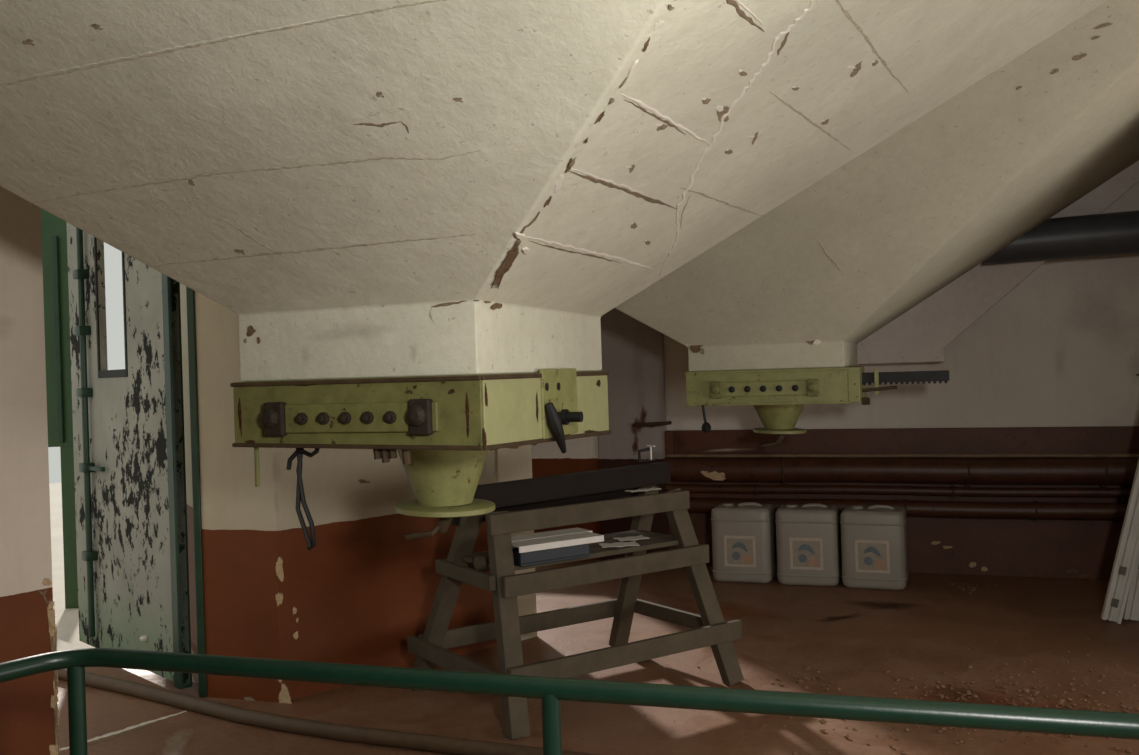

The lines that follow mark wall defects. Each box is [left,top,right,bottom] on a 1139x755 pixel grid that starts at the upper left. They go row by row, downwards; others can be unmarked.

spalling [595,5,674,124]
crack [525,0,908,278]
spalling [484,158,576,310]
peeling [275,557,299,639]
peeling [278,680,292,704]